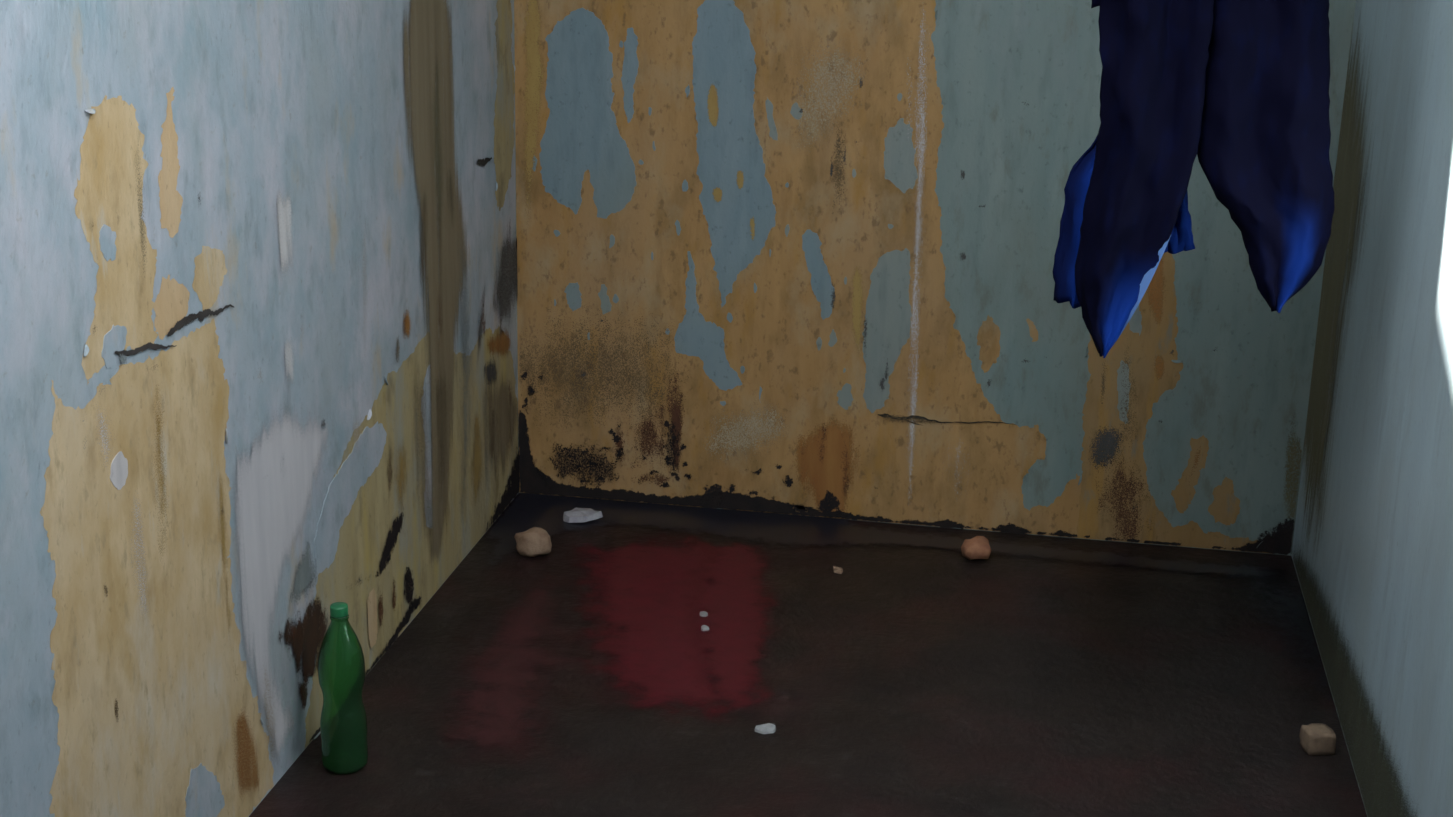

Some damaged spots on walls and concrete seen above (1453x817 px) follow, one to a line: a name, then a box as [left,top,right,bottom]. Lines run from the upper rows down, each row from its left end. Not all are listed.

peeling [40,87,274,817]
peeling [305,0,1272,748]
water stain [350,0,1420,817]